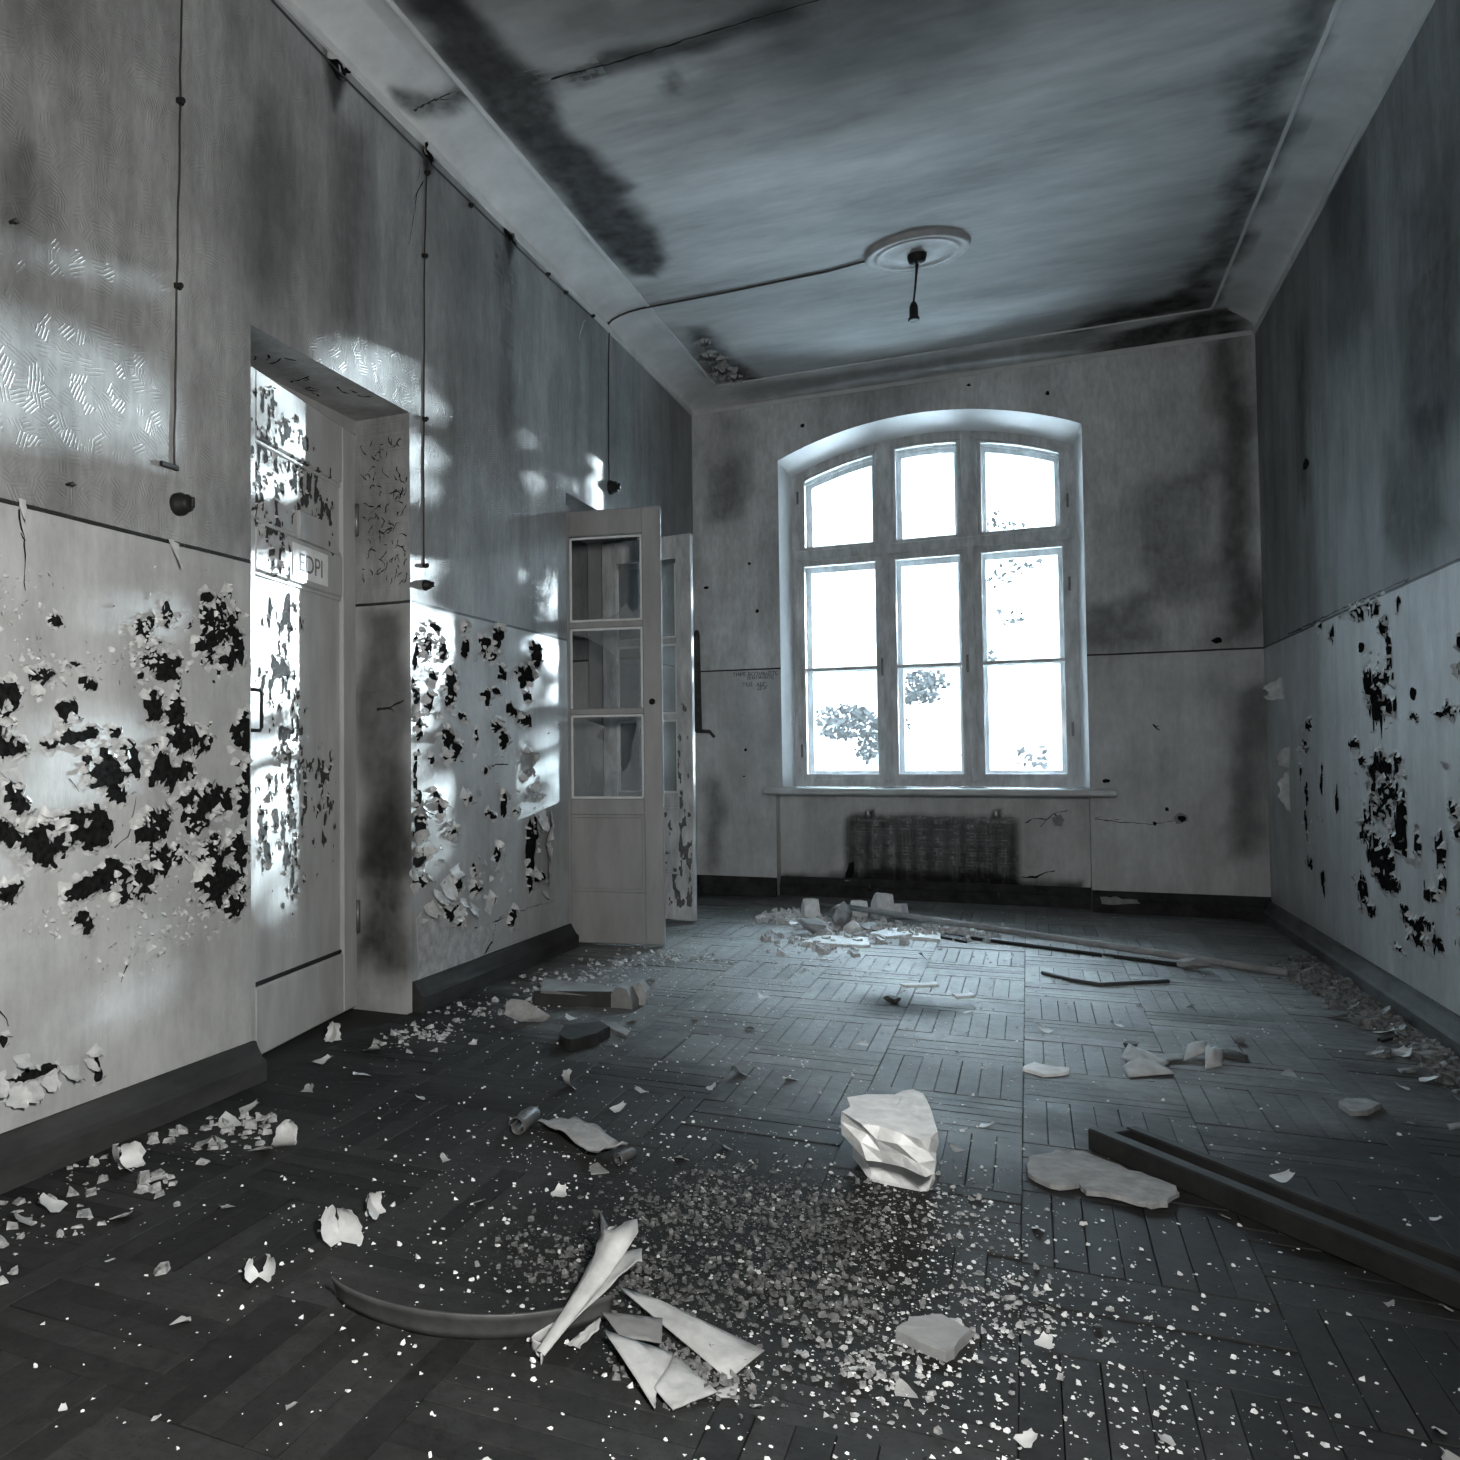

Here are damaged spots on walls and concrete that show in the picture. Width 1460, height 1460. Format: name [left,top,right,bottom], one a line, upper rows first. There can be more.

leakage [328,58,344,102]
leakage [395,0,663,275]
leakage [568,0,826,81]
peeling [0,386,336,996]
flaking render [409,618,561,980]
peeling [1263,677,1284,701]
peeling [1277,590,1460,960]
peeling [0,1030,107,1109]